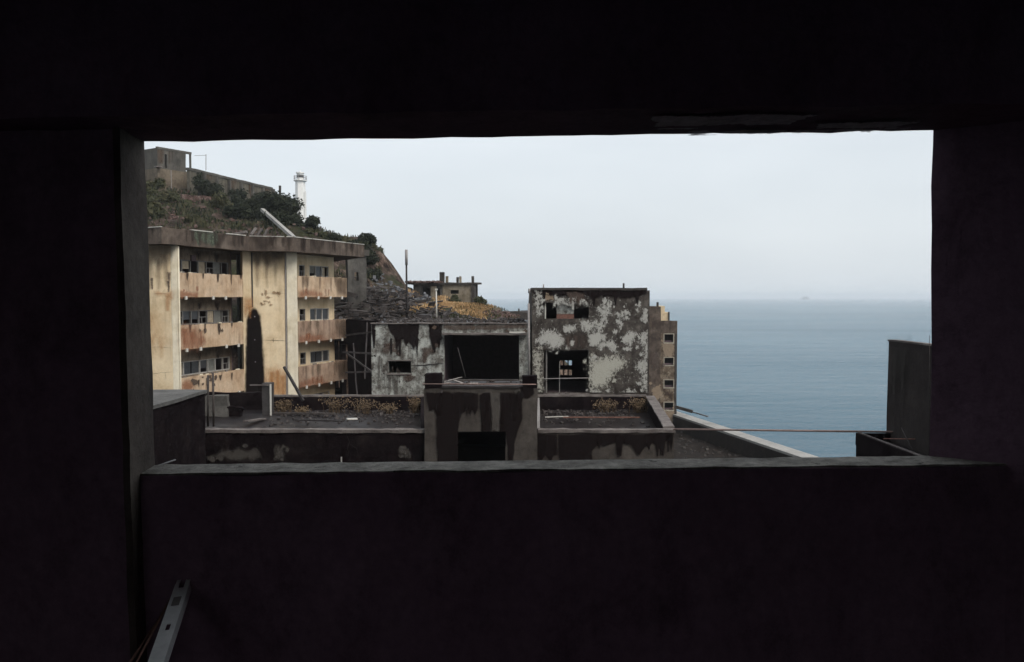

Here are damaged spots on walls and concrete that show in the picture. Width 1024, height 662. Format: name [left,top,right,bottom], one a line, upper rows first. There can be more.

rust [182,328,202,347]
damp [371,322,443,395]
peeling [431,290,675,400]
damp [426,391,523,462]
damp [537,433,673,460]